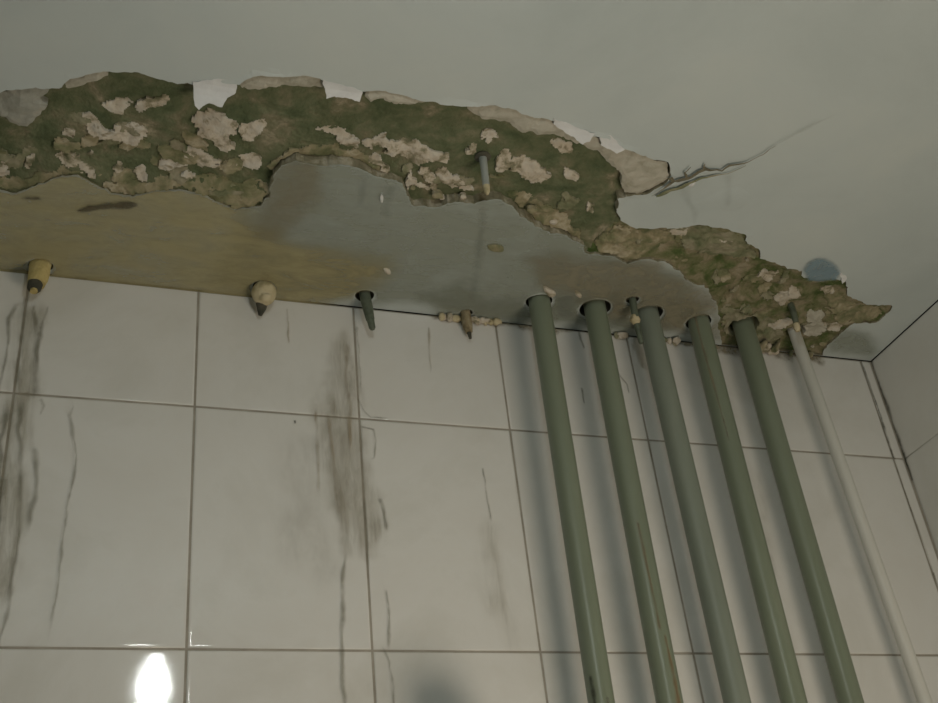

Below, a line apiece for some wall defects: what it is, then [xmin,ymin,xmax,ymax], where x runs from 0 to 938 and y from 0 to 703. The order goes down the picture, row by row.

flaking render [0,71,892,355]
crack [652,146,775,197]